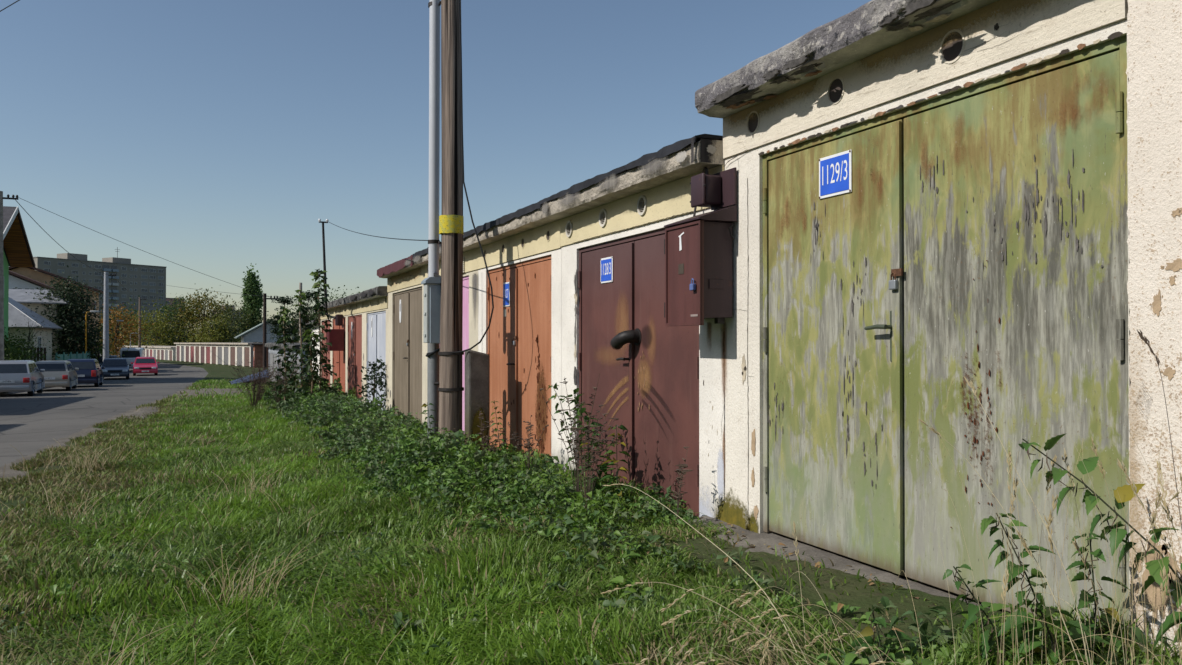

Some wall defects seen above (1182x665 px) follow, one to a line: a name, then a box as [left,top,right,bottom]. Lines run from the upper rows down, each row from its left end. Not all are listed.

water stain [794,0,905,52]
water stain [730,79,816,122]
rust [617,304,628,333]
peeling [1150,258,1182,316]
rust [525,334,549,454]
rust [606,327,671,425]
rust [960,330,1001,506]
peeling [1133,537,1182,628]